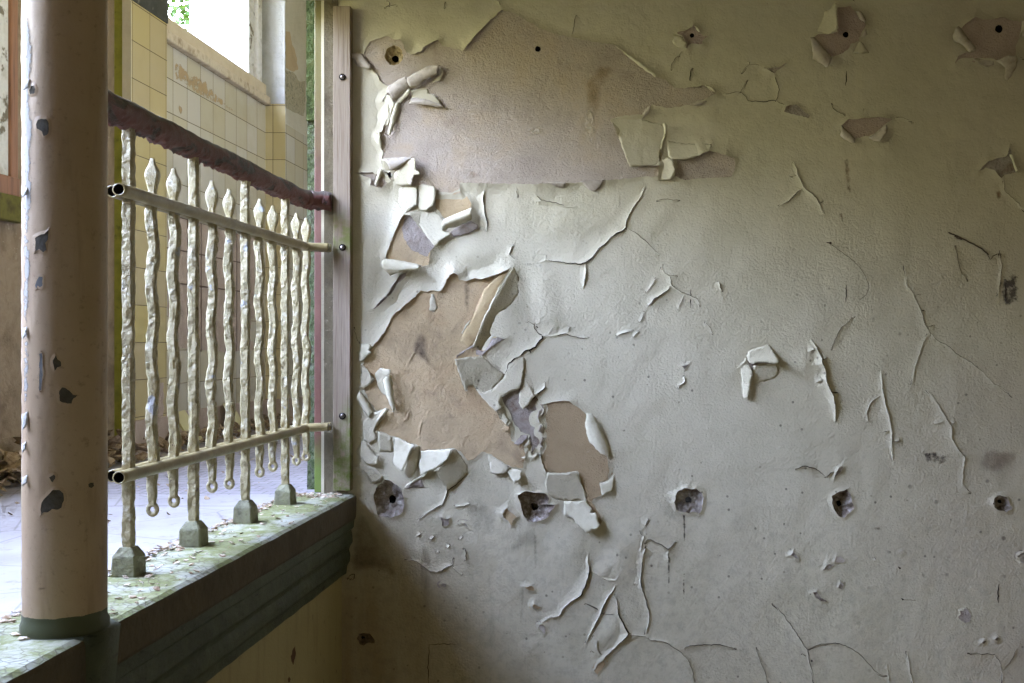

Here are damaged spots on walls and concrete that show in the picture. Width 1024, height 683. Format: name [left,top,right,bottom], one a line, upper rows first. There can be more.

peeling [805,0,879,67]
peeling [946,7,1024,80]
crack [778,161,825,216]
peeling [21,15,64,453]
peeling [352,1,745,533]
peeling [737,345,779,399]
crack [799,285,901,460]
crack [903,266,1012,495]
crack [795,466,834,479]
spalling [827,462,858,521]
crack [537,517,771,683]
crack [772,603,913,683]